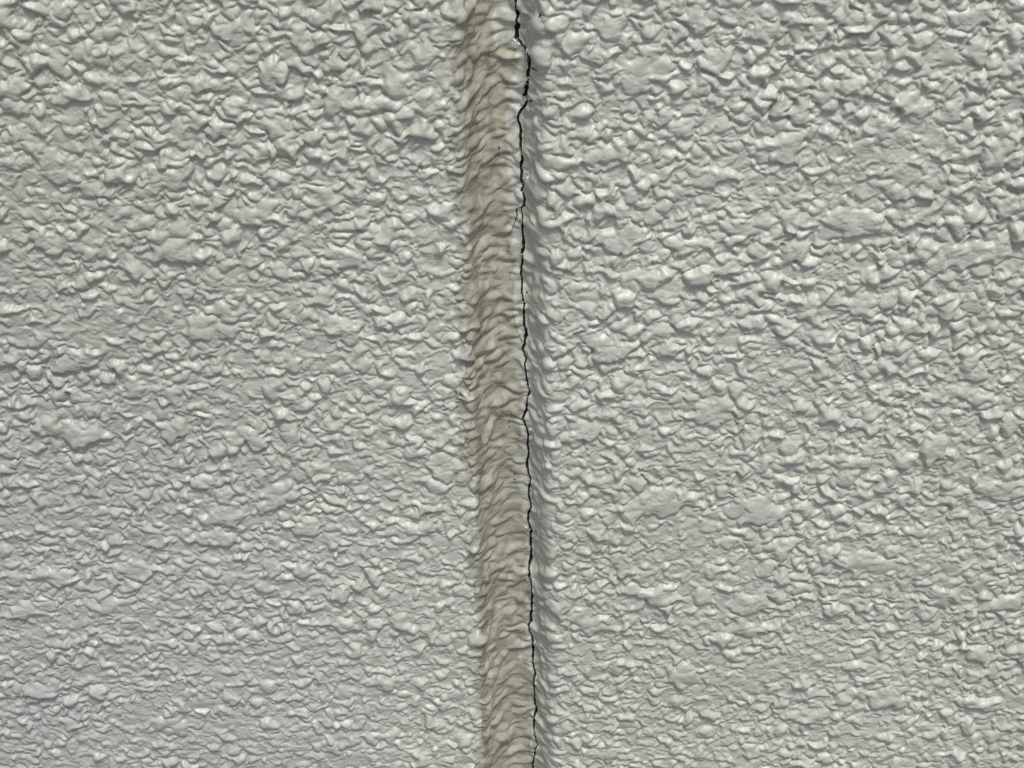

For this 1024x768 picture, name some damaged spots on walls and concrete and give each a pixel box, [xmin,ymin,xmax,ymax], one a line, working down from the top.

crack [508,0,538,768]